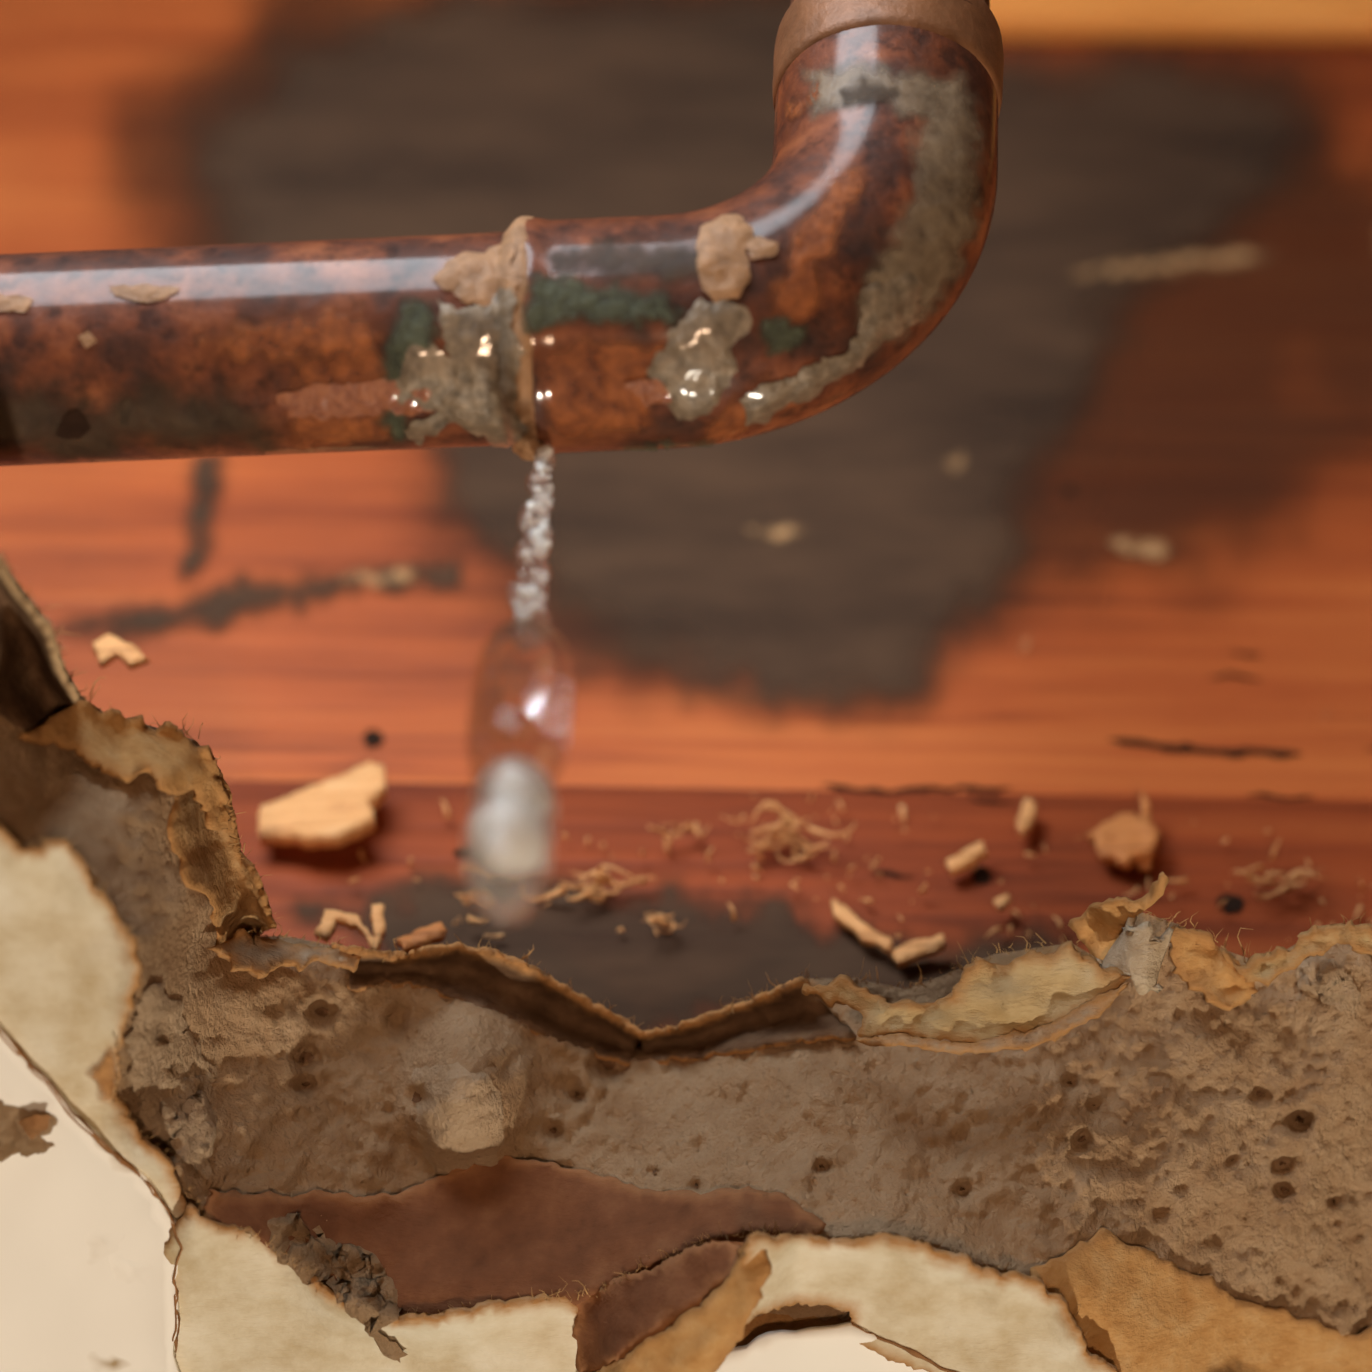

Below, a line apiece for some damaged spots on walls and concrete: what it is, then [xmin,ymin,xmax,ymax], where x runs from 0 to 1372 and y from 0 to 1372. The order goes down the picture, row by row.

water stain [130,0,791,246]
water stain [276,377,433,421]
water stain [437,52,1372,707]
water stain [181,457,222,577]
water stain [75,563,460,637]
peeling [1068,872,1174,995]
peeling [0,1101,58,1162]
peeling [203,1155,826,1316]
peeling [735,1313,849,1347]
peeling [1029,1227,1372,1372]